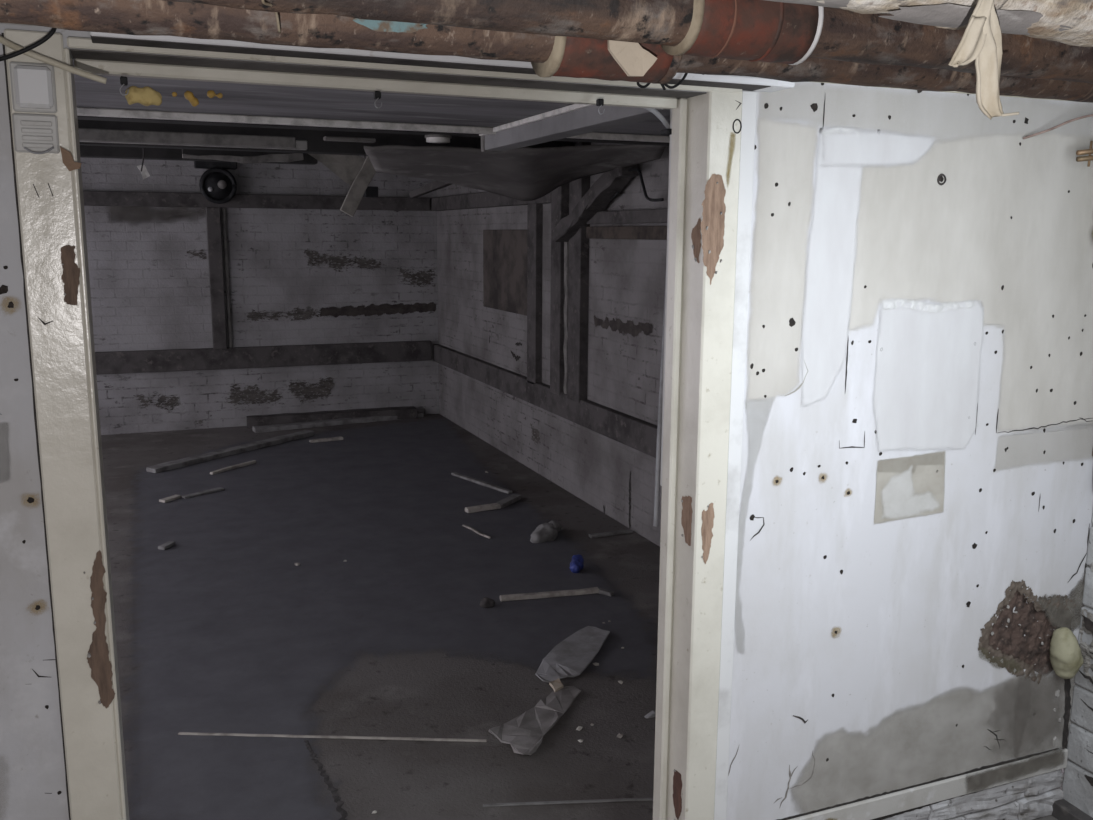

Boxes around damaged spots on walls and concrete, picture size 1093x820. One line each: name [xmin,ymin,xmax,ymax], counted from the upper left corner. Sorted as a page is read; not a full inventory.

peeling [691,174,726,285]
peeling [681,495,715,564]
peeling [83,550,116,708]
spalling [978,563,1093,684]
peeling [673,769,682,820]
water stain [789,659,1075,815]